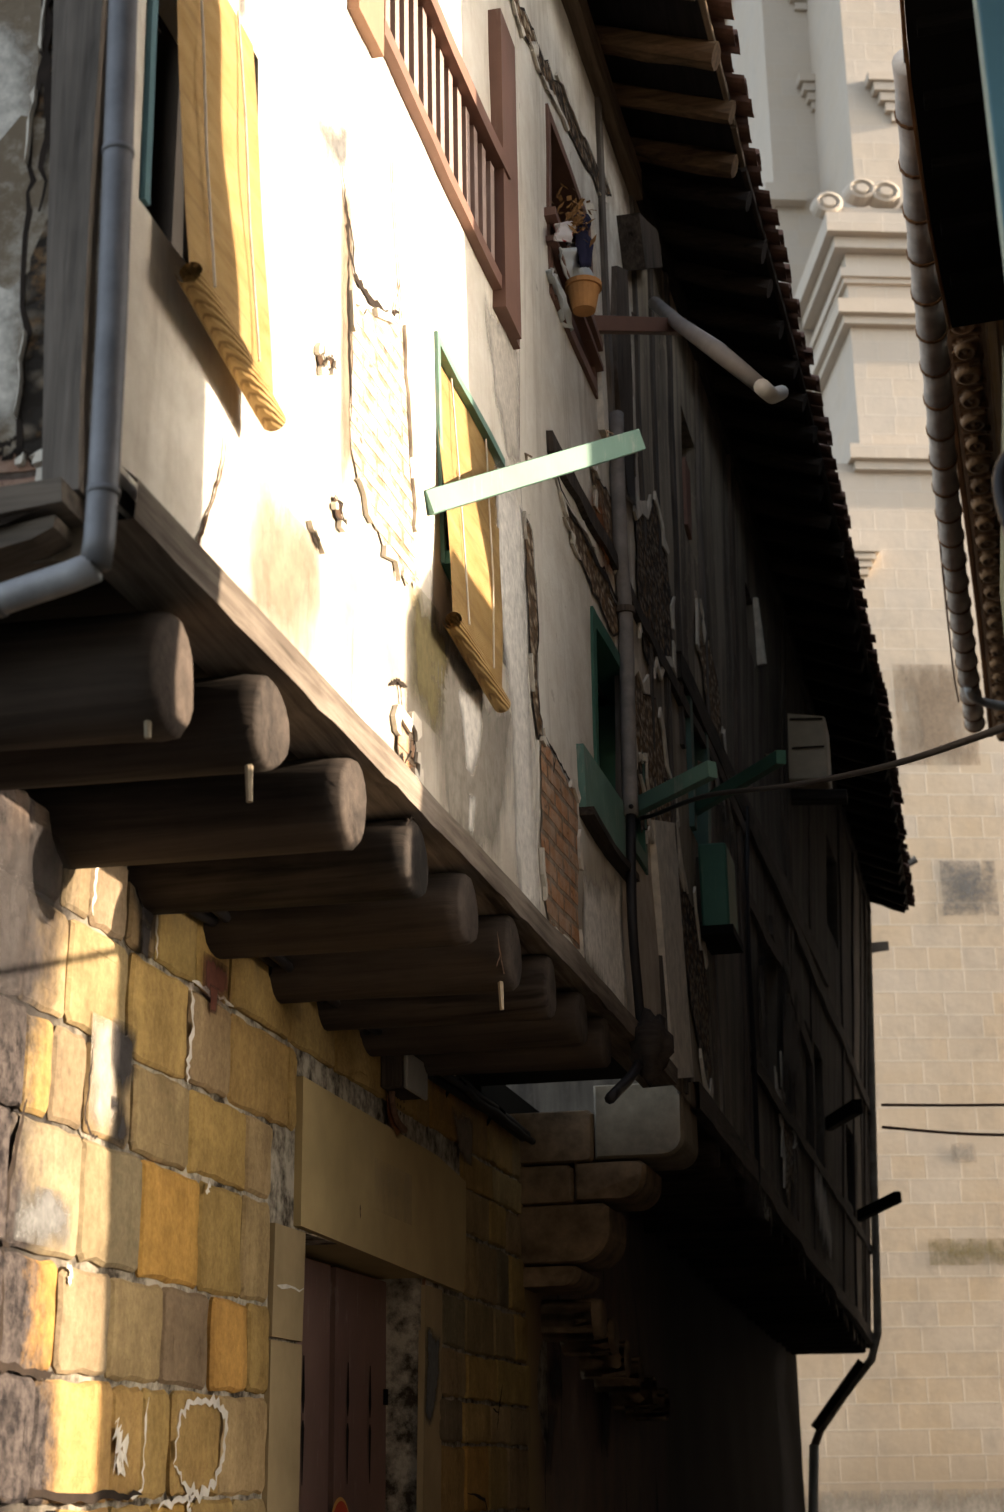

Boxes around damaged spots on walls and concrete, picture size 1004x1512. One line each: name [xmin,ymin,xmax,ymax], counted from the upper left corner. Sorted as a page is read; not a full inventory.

flaking render [0,0,54,487]
flaking render [306,290,421,588]
flaking render [522,511,584,957]
flaking render [558,452,676,795]
flaking render [694,591,734,831]
leakage [895,664,978,765]
flaking render [641,798,713,1098]
leakage [940,861,998,915]